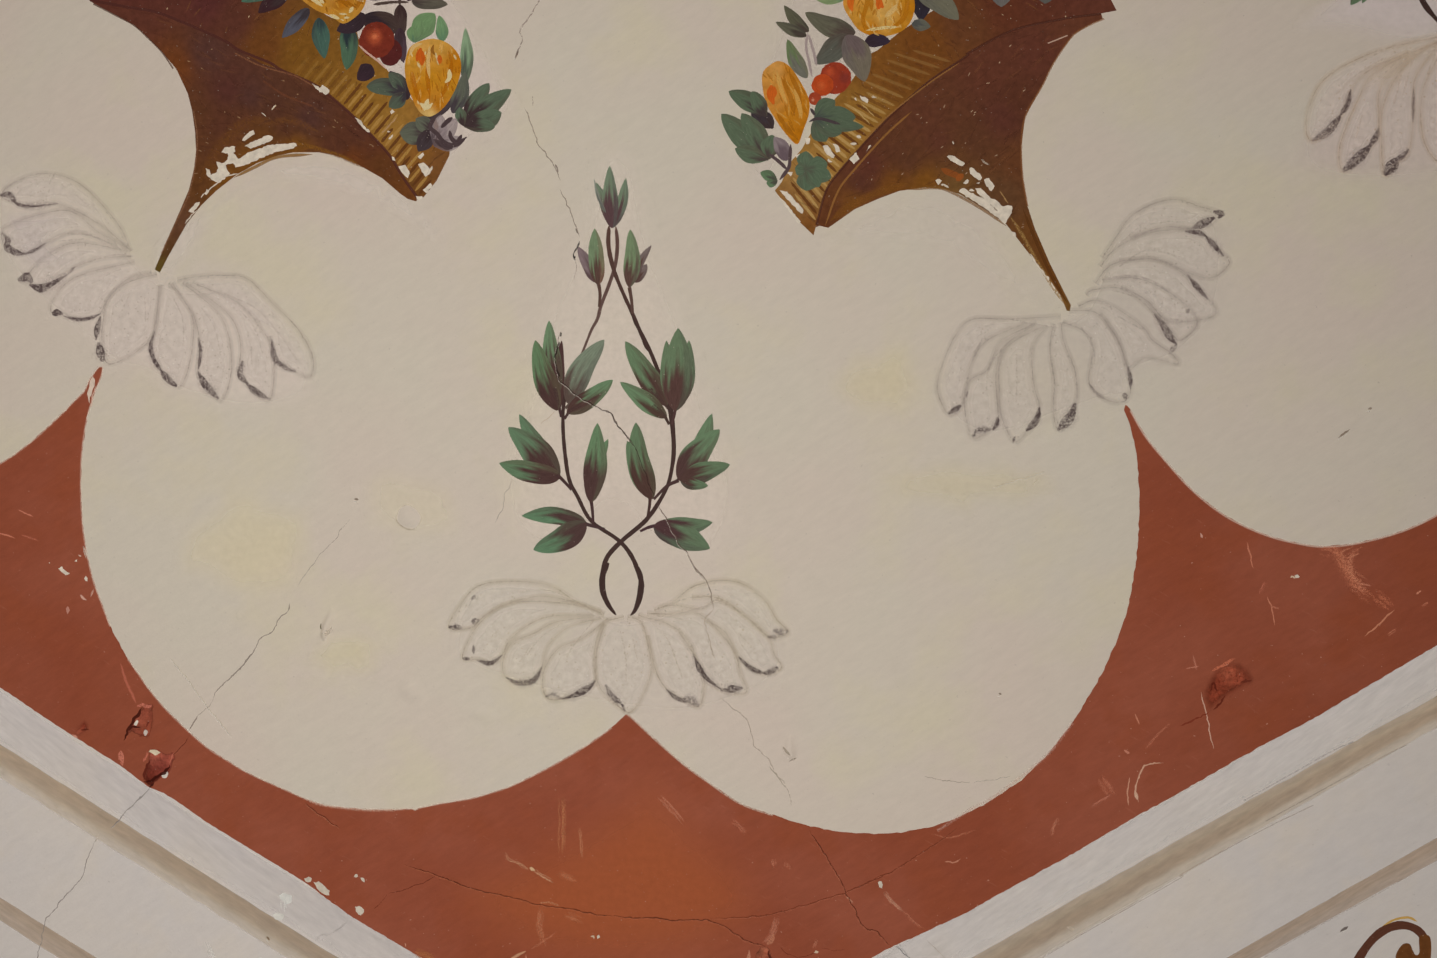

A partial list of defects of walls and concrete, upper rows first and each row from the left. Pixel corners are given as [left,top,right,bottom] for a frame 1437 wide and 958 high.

crack [515,0,540,57]
peeling [185,130,297,223]
crack [526,97,580,278]
peeling [936,142,1016,237]
crack [174,523,347,754]
spalling [118,703,175,788]
crack [37,788,150,958]
crack [375,865,837,958]
crack [810,832,945,958]